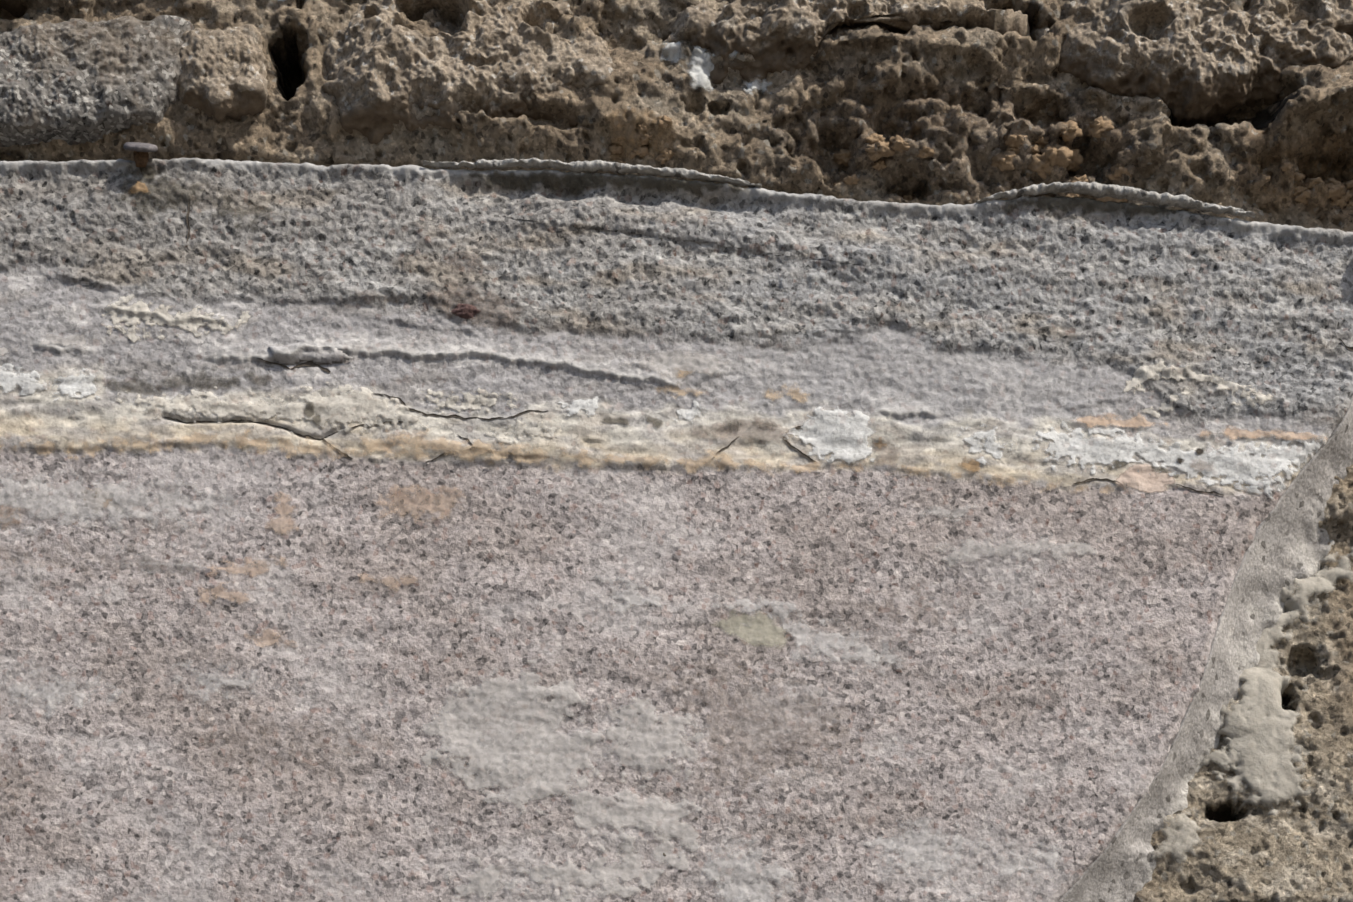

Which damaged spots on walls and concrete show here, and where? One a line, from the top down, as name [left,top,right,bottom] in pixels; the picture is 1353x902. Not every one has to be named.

corrosion [130,165,156,194]
crack [257,358,331,372]
peeling [1123,360,1275,418]
crack [165,393,547,462]
peeling [647,400,709,427]
crack [783,425,816,462]
peeling [728,406,887,466]
peeling [957,424,1013,472]
peeling [1032,420,1325,499]